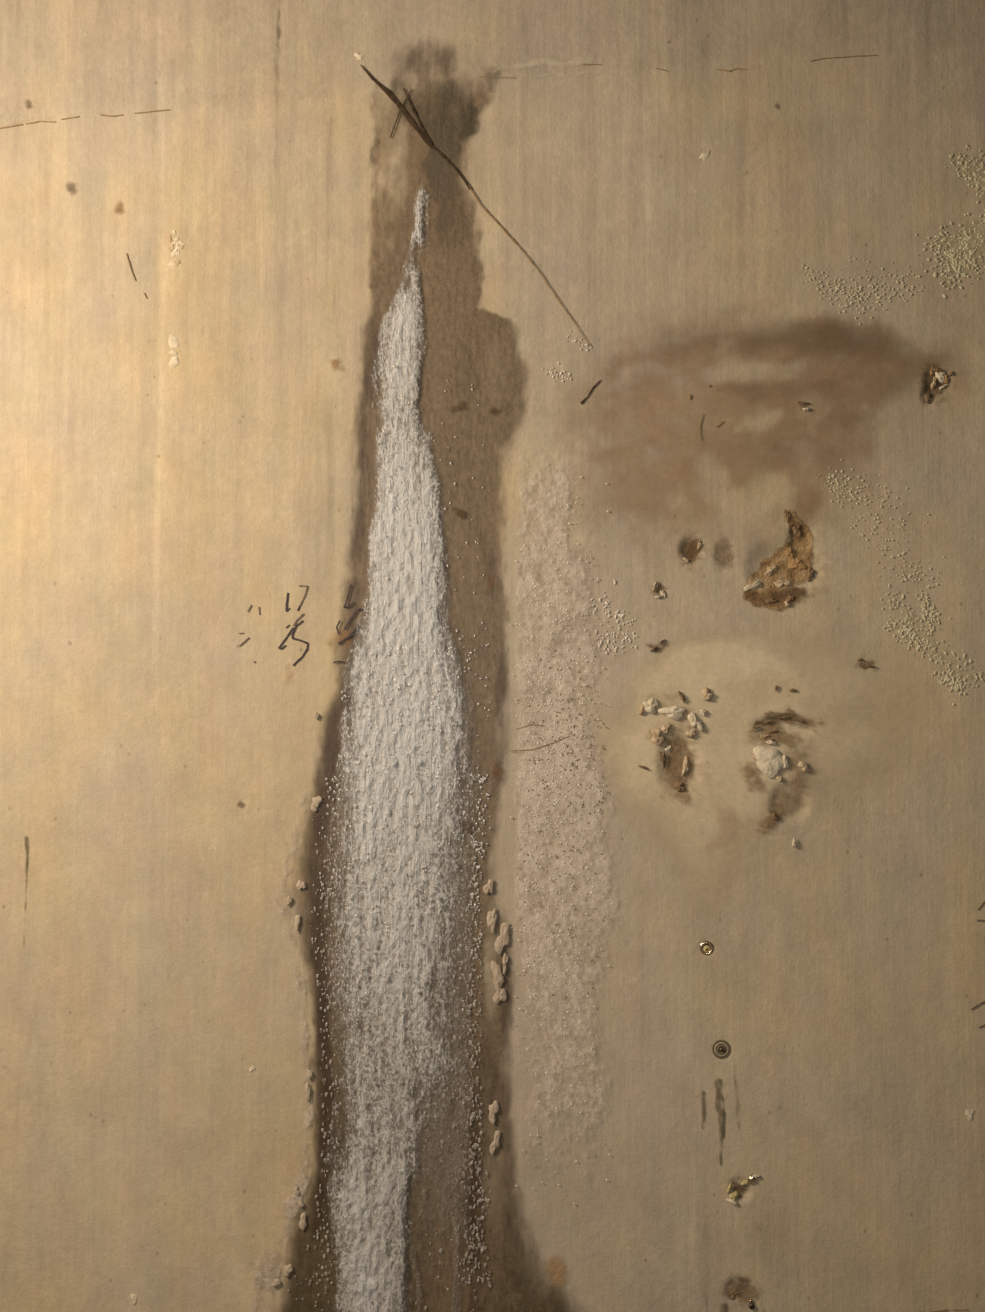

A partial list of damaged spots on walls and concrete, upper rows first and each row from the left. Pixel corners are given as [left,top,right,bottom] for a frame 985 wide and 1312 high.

water stain [606,320,940,520]
spalling [742,509,815,611]
water stain [254,52,617,1312]
spalling [637,687,714,801]
spalling [744,708,822,829]